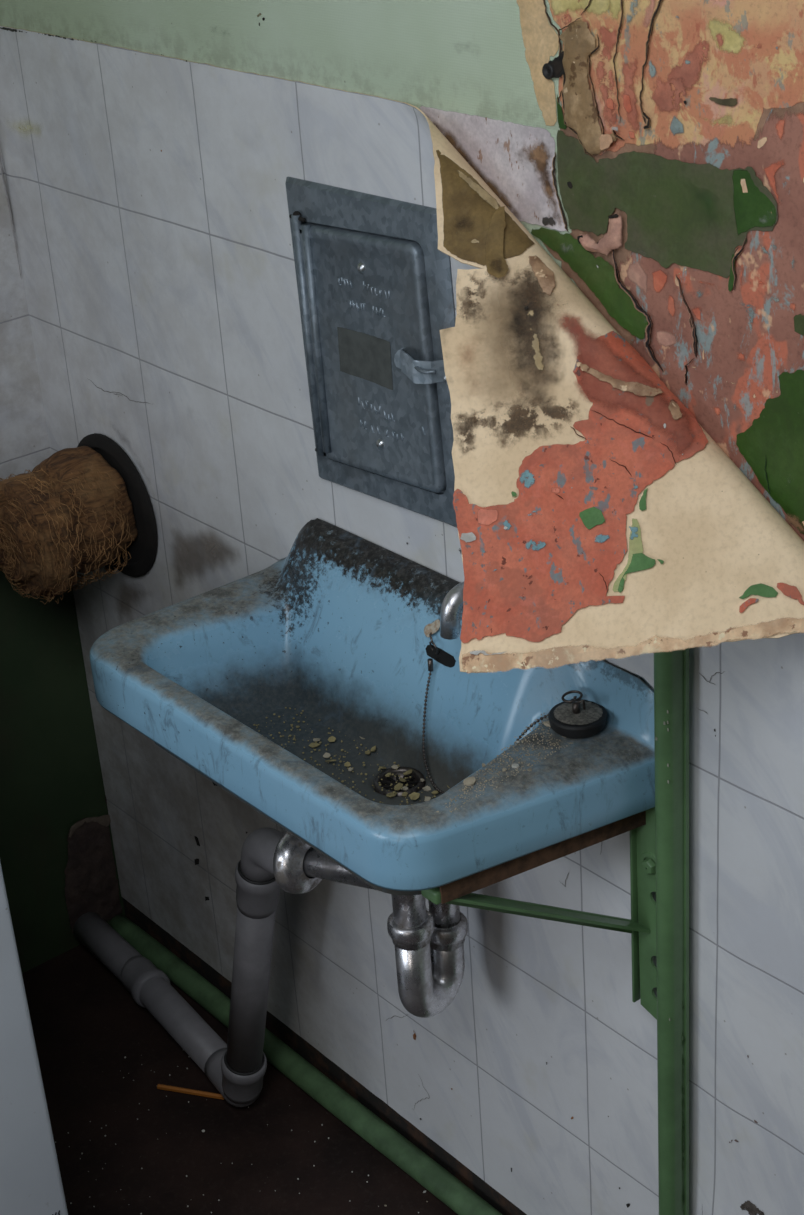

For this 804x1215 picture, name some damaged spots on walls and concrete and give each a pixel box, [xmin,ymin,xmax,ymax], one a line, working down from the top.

crack [543,0,662,231]
peeling [419,0,804,541]
leakage [457,400,575,452]
leakage [576,361,682,420]